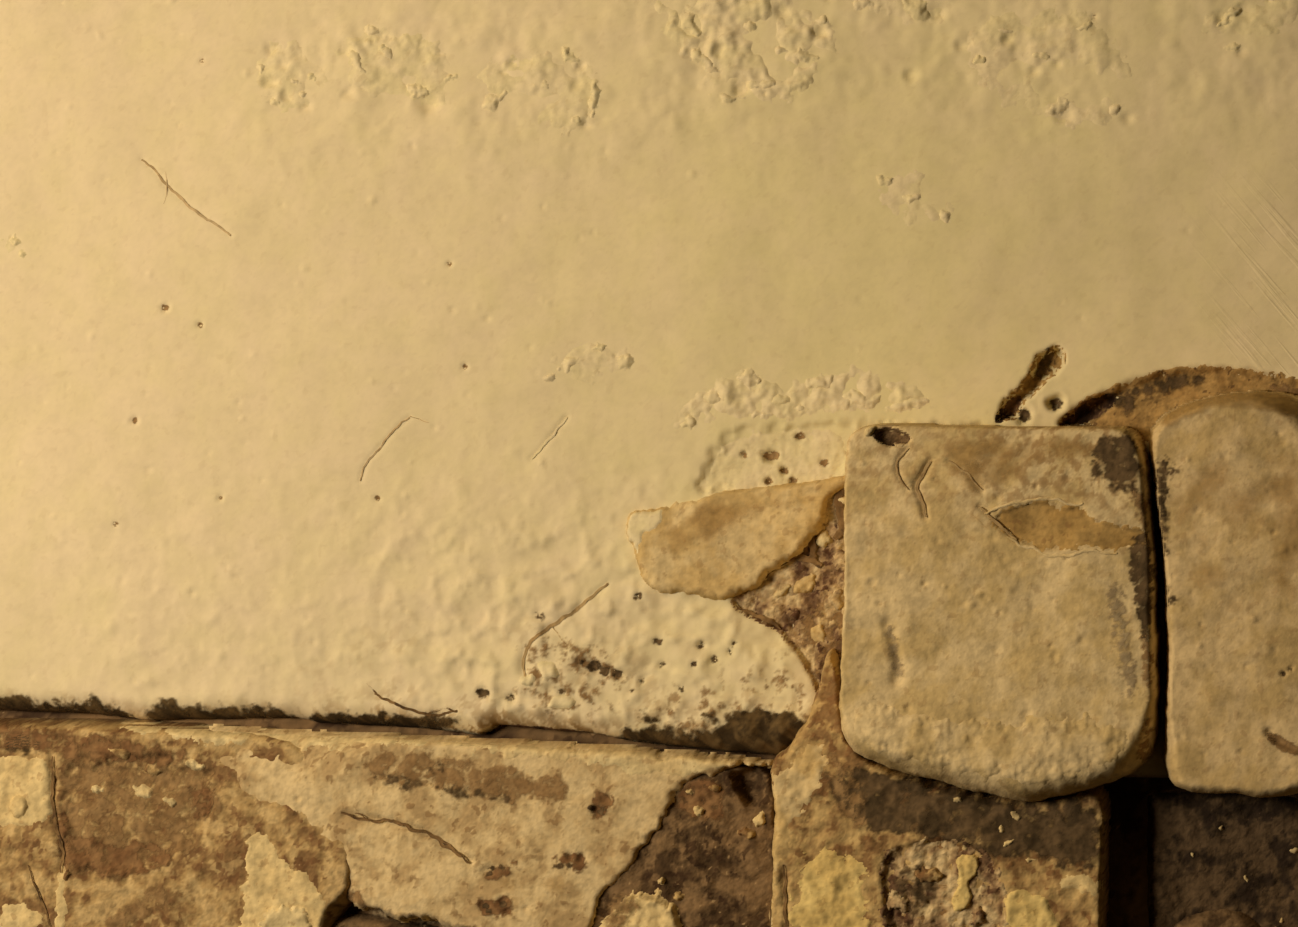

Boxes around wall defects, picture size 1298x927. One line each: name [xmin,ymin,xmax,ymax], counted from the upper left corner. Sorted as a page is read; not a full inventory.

water stain [1164,391,1298,424]
flaking render [626,509,662,558]
flaking render [673,364,929,692]